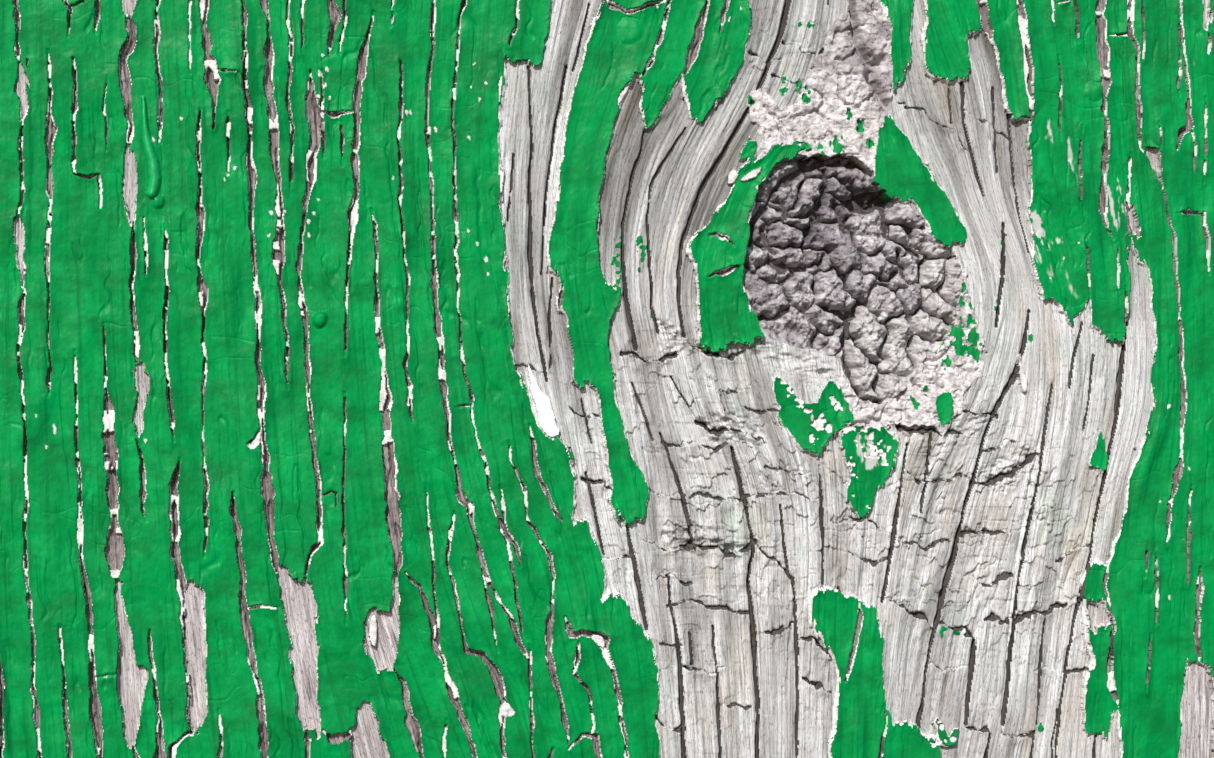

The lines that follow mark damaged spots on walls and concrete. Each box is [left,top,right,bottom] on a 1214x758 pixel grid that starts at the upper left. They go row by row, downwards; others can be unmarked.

crack [0,0,629,758]
crack [507,0,730,382]
peeling [467,0,1171,758]
crack [569,0,1212,758]